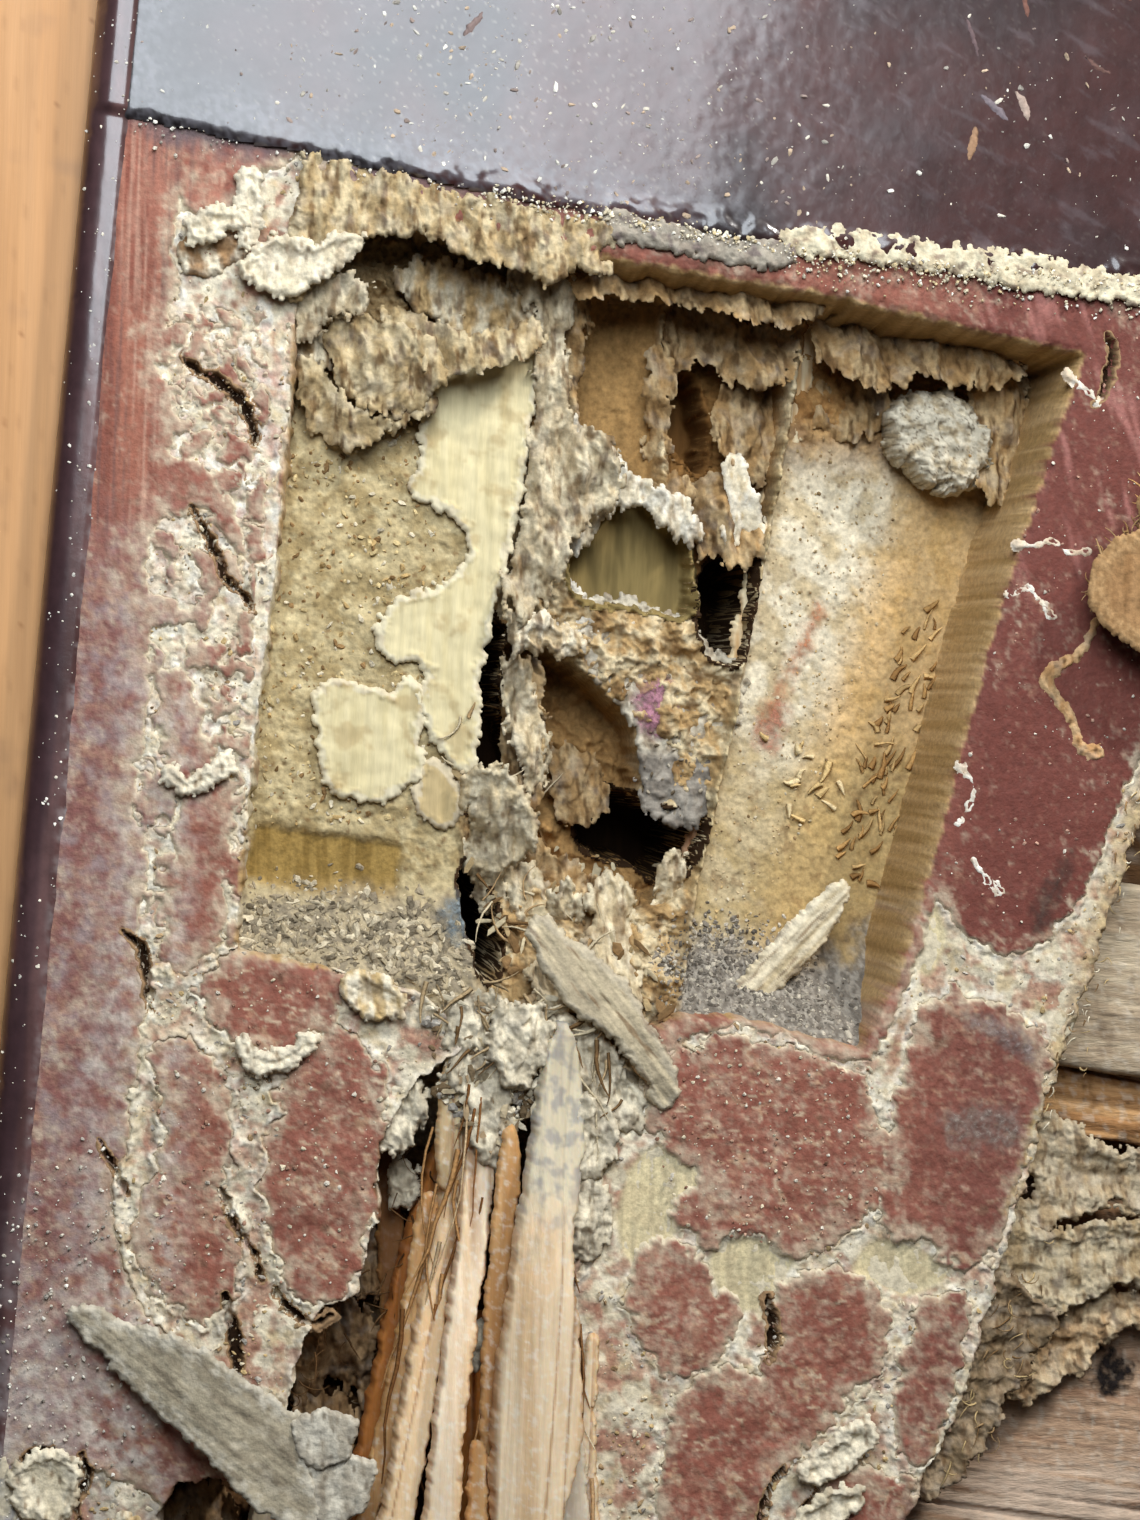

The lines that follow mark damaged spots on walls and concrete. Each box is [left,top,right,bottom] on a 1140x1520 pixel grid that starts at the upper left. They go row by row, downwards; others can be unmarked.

crack [179,352,262,449]
crack [188,502,256,615]
spalling [111,150,1140,1453]
crack [96,1137,131,1197]
crack [758,1291,783,1366]
peeling [574,1124,1038,1520]
spalling [414,1426,432,1520]
crack [754,1463,820,1520]